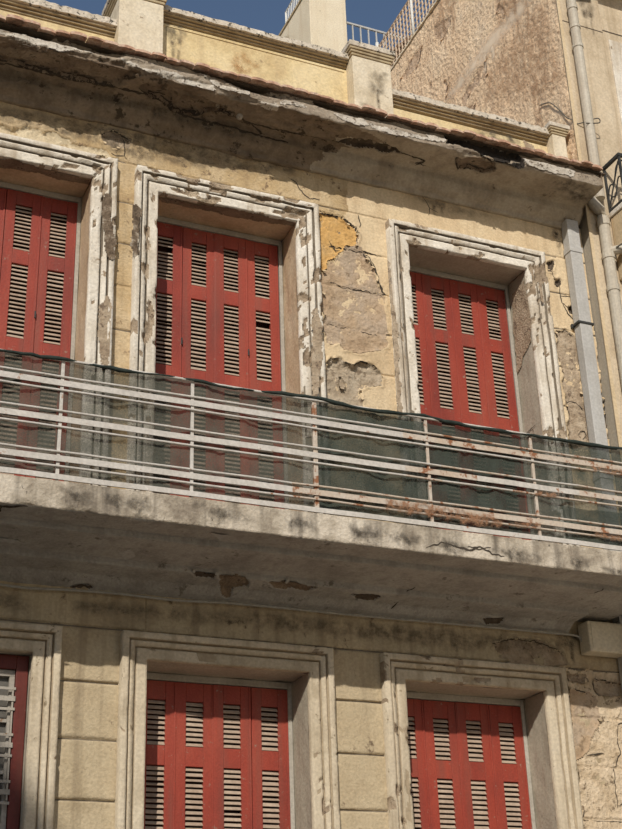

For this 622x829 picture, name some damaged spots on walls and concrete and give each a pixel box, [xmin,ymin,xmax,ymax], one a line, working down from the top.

leakage [448,0,557,96]
crack [0,63,327,143]
spalling [0,159,90,185]
spalling [327,113,575,177]
peeling [311,210,403,412]
peeling [512,281,531,372]
peeling [555,330,589,442]
crack [0,504,28,512]
spalling [192,569,250,598]
corrosion [388,501,501,526]
crack [426,542,503,557]
peeling [493,637,622,829]